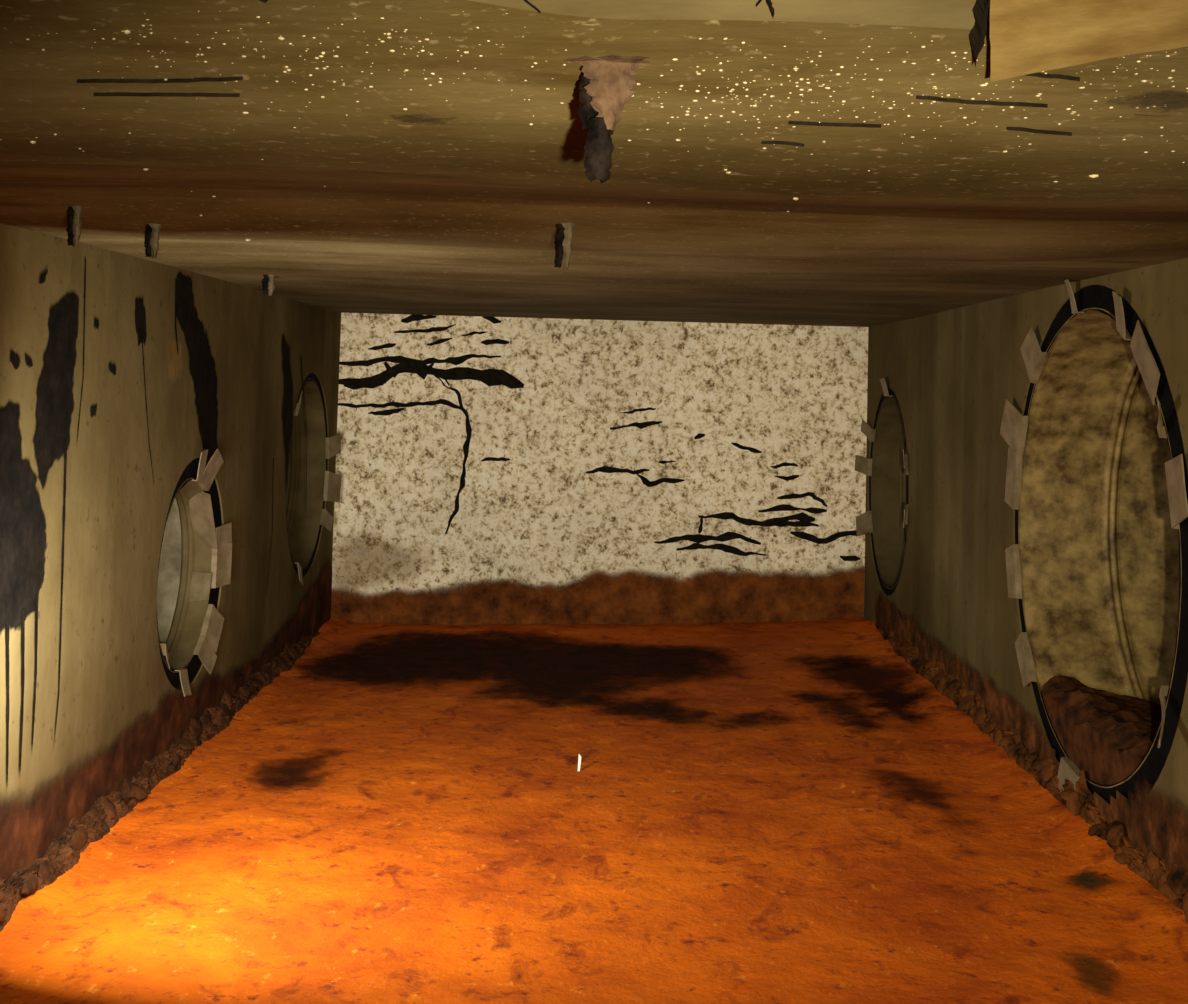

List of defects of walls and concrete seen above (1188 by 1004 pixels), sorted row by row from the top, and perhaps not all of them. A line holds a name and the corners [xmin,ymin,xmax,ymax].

peeling [563,55,650,183]
water stain [0,259,99,784]
water stain [135,298,154,482]
water stain [174,273,218,465]
crack [338,315,524,534]
crack [586,461,685,487]
crack [610,407,662,430]
crack [654,433,861,561]